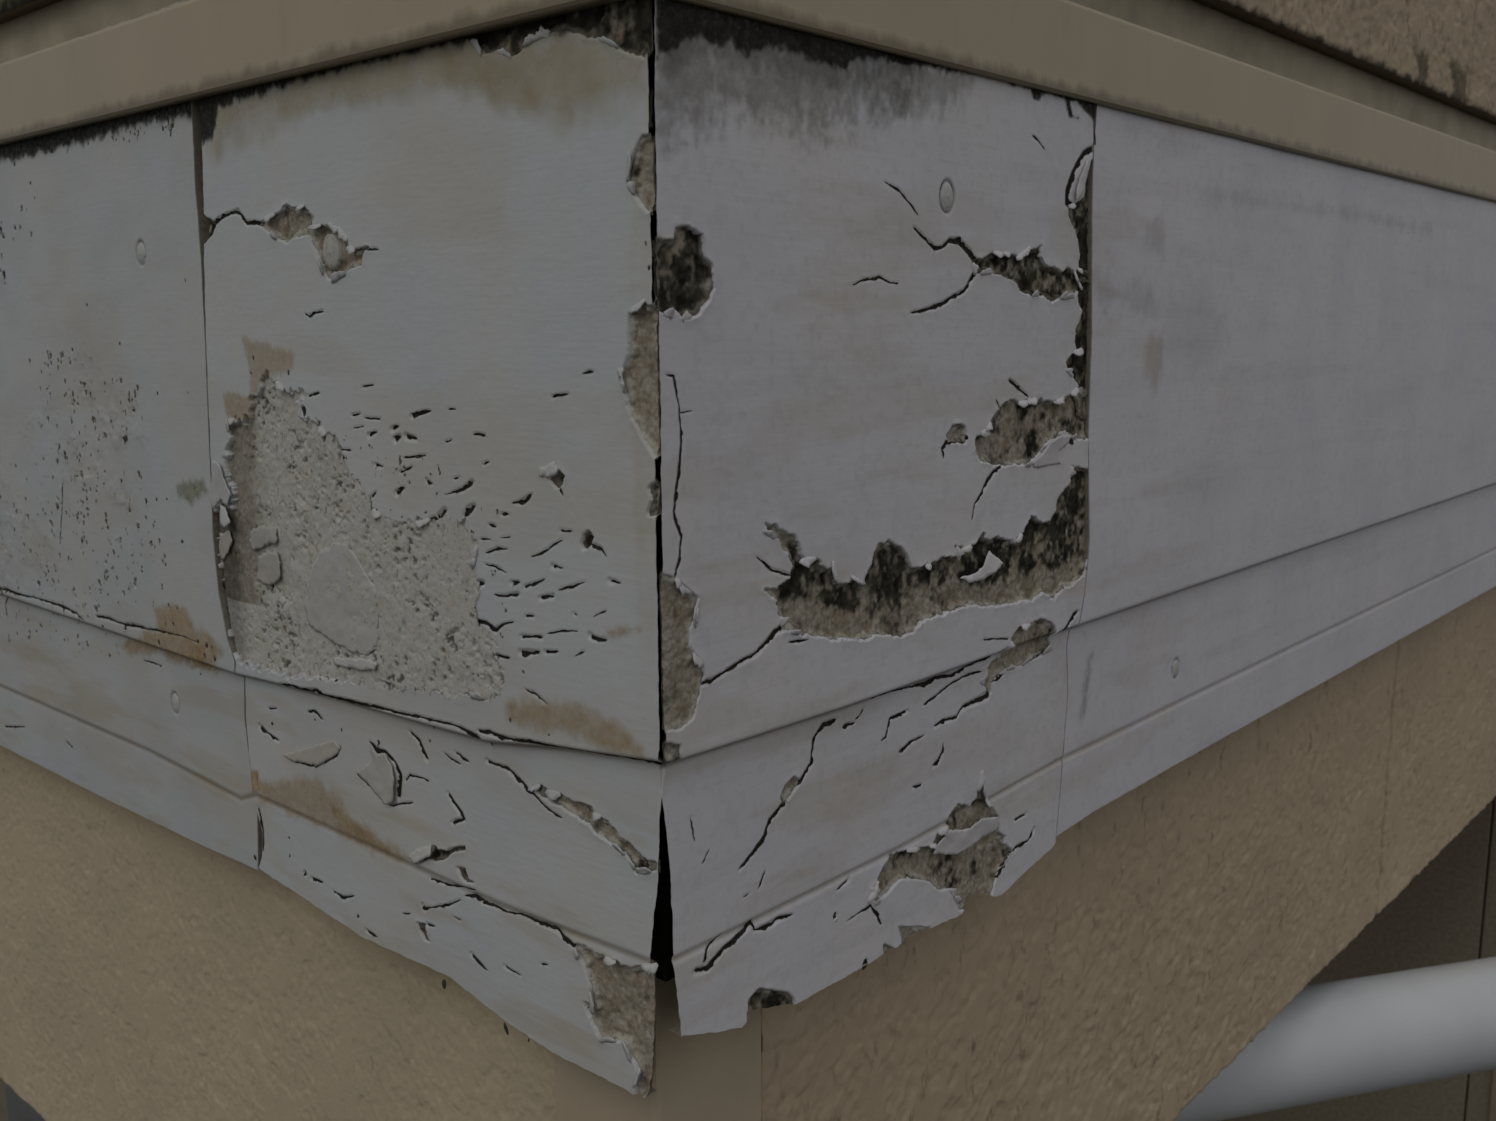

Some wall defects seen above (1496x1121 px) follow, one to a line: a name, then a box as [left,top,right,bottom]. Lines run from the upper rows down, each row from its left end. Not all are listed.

damp [650,0,957,71]
damp [1011,83,1096,120]
spalling [617,226,713,459]
crack [853,182,1083,313]
peeling [210,356,504,703]
crack [261,384,663,875]
crack [666,374,692,577]
spalling [757,348,1088,643]
crack [288,836,461,941]
spalling [407,845,658,1096]
crack [690,611,1078,972]
spalling [833,770,1032,953]